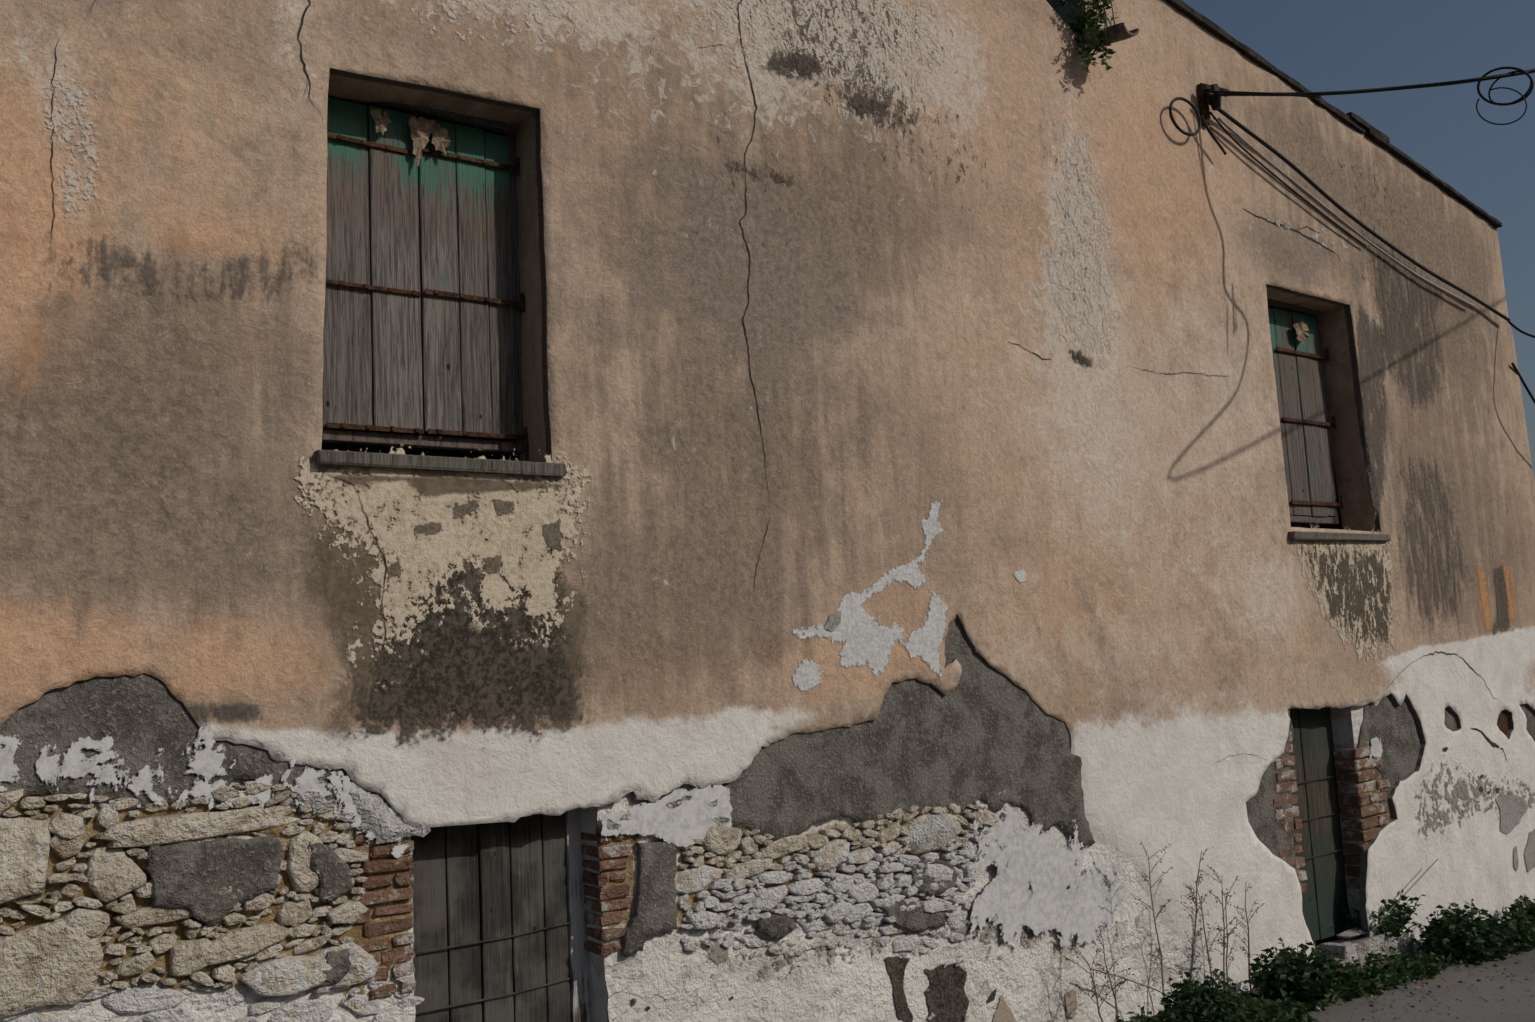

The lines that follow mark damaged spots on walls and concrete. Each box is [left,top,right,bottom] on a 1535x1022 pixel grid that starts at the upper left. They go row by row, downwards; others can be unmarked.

crack [50,0,96,241]
crack [298,0,323,121]
leakage [668,0,953,121]
leakage [68,239,158,295]
leakage [177,247,313,299]
crack [697,0,770,591]
leakage [1357,221,1470,629]
peeling [286,444,596,677]
flaking render [0,673,431,858]
flaking render [601,498,1136,1022]
flaking render [1246,709,1307,893]
flaking render [1333,695,1535,889]